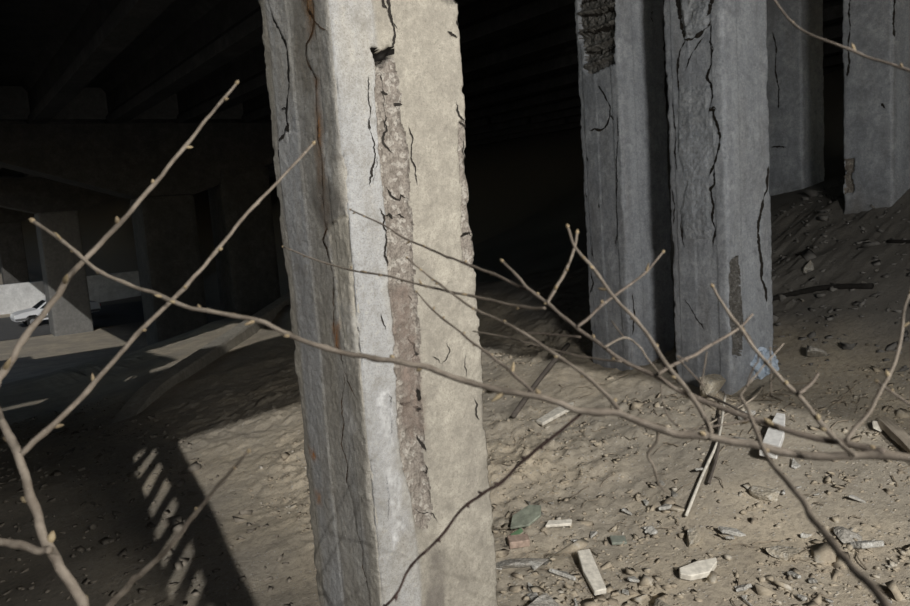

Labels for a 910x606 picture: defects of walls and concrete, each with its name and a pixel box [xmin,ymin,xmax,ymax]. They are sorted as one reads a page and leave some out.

spalling [577,0,616,74]
crack [844,0,852,76]
crack [368,0,418,266]
crack [672,0,721,247]
crack [270,0,370,600]
spalling [374,58,433,529]
crack [389,388,421,443]
crack [416,435,428,474]
crack [407,336,467,374]
crack [757,146,786,301]